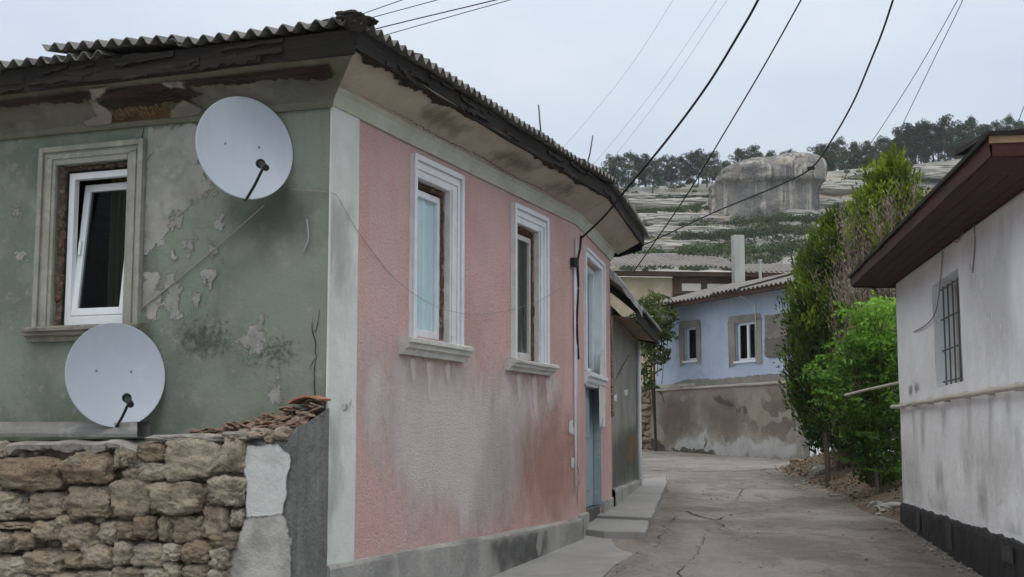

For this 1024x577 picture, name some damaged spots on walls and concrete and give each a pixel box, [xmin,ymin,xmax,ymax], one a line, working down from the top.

peeling [0,64,333,323]
peeling [234,313,269,359]
spalling [651,438,715,455]
crack [616,469,798,577]